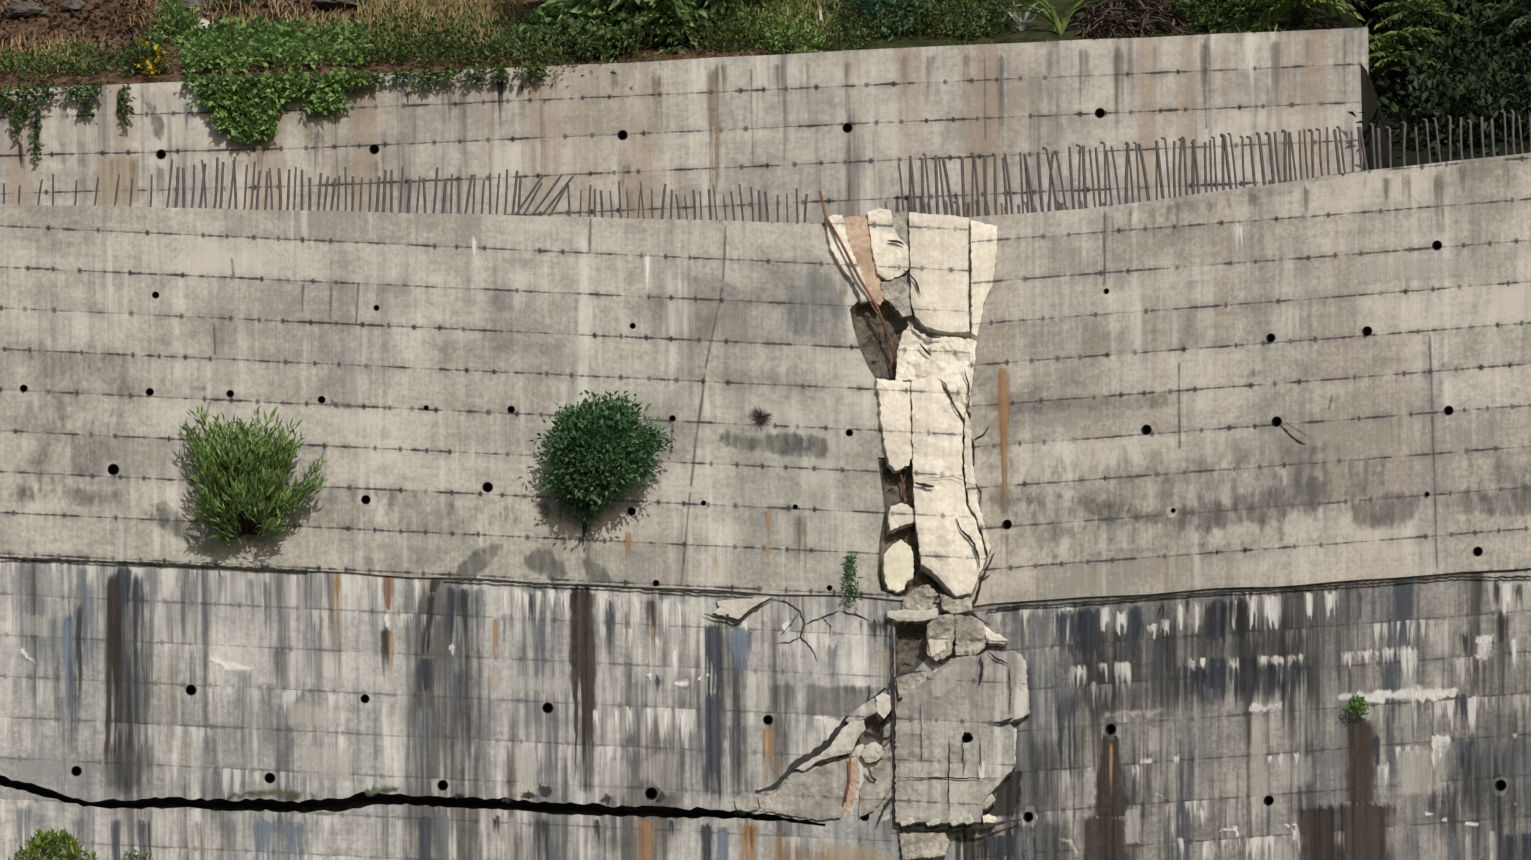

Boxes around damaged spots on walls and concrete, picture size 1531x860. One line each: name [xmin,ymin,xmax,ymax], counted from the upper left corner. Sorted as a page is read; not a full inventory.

spalling [3,174,54,205]
spalling [74,174,133,207]
peeling [149,109,1531,860]
rust [999,368,1008,498]
leakage [43,564,155,786]
crack [0,578,1022,831]
leakage [415,545,751,796]
leakage [701,823,728,860]
leakage [956,596,1476,860]
leakage [1306,591,1335,623]
leakage [1378,717,1531,860]
leakage [1463,581,1531,689]